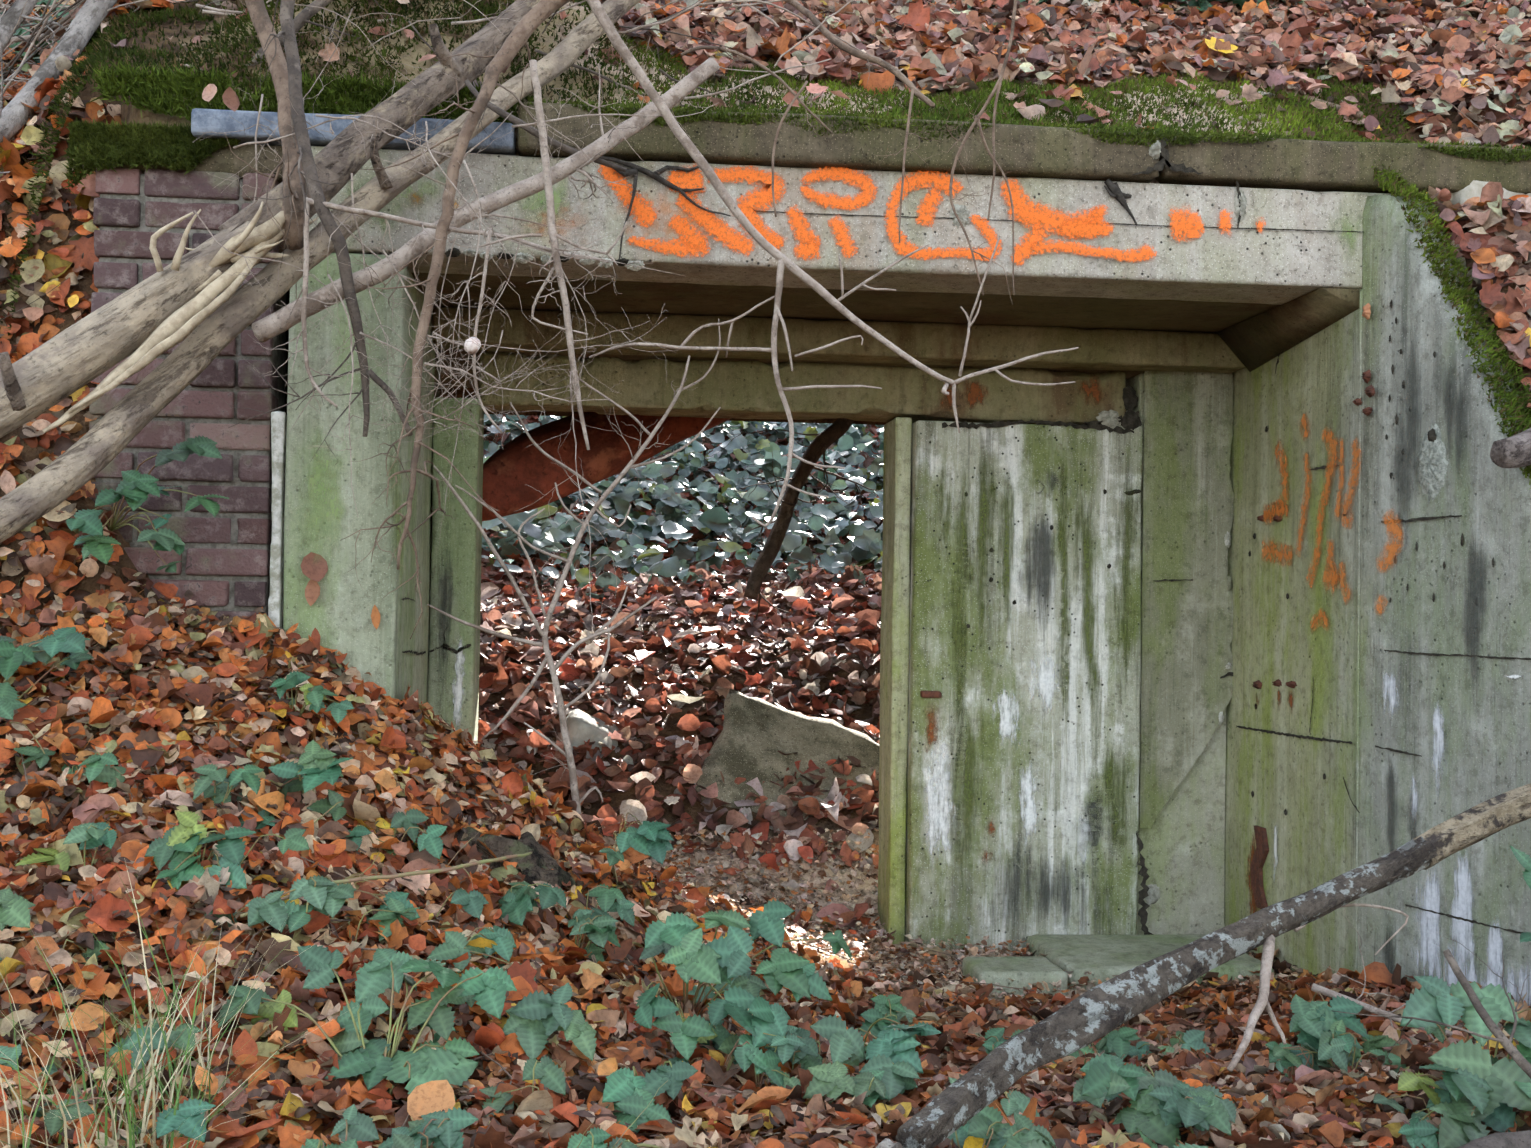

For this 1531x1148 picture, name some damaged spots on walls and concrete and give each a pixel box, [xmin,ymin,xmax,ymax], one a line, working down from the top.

damp [439,568,465,722]
rust [926,709,939,751]
damp [927,461,1099,870]
damp [1114,487,1138,664]
rust [1252,679,1297,709]
damp [1006,754,1129,920]